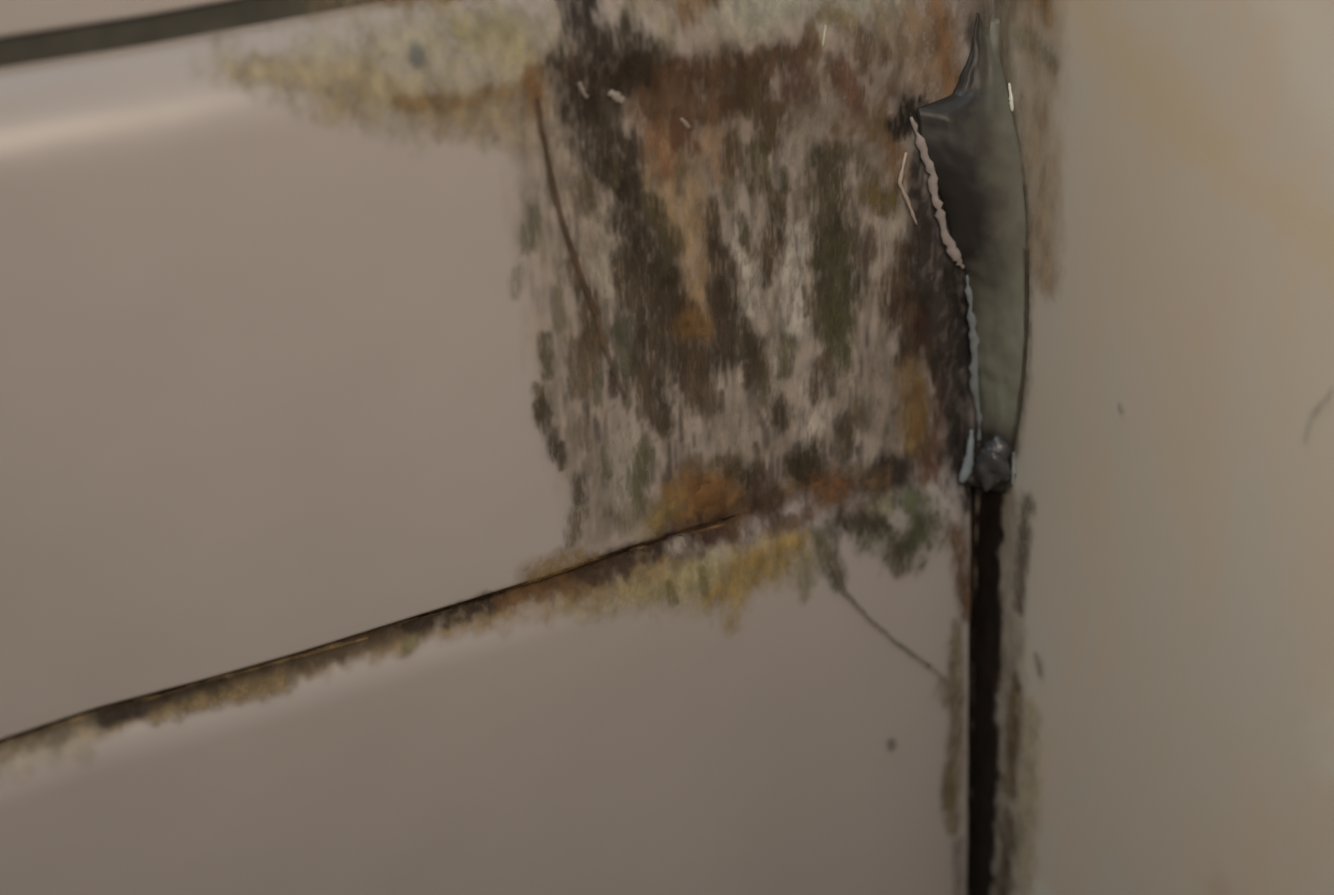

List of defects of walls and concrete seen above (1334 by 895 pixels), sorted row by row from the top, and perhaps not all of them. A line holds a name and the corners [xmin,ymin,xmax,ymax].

damp [236,0,976,623]
damp [1010,221,1029,453]
rust [0,466,753,760]
damp [990,490,1041,895]